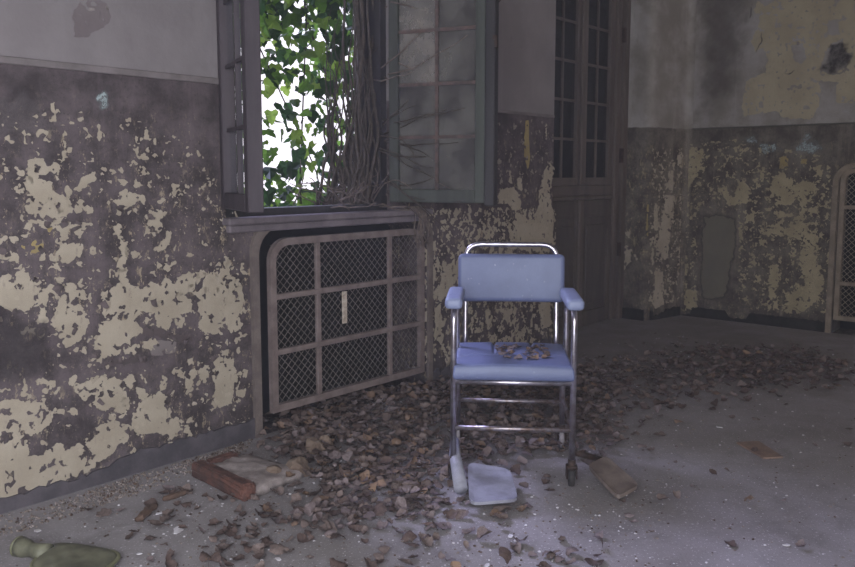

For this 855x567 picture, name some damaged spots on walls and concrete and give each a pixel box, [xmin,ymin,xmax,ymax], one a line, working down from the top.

water stain [822,43,852,73]
peeling [0,102,250,498]
peeling [424,119,556,367]
peeling [646,139,832,314]